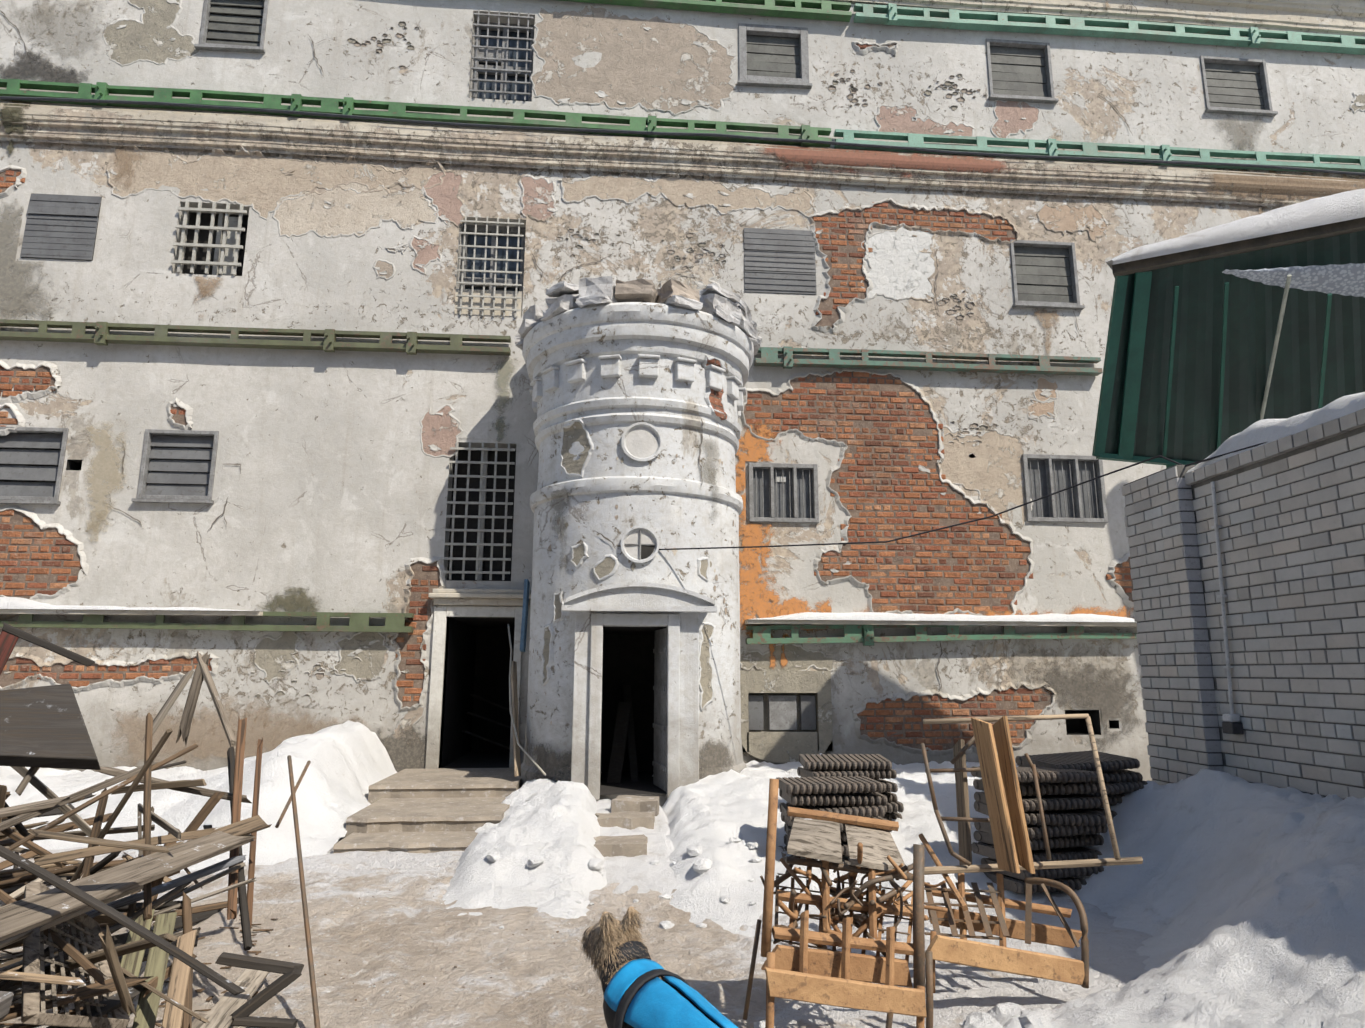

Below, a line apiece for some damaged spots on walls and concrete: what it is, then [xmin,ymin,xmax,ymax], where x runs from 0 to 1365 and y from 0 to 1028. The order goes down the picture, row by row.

flaking render [102,0,201,67]
flaking render [530,4,737,116]
flaking render [0,165,27,198]
flaking render [518,171,1020,334]
flaking render [0,360,62,436]
flaking render [1026,377,1059,422]
flaking render [543,419,624,478]
flaking render [703,355,1035,616]
flaking render [0,505,89,600]
flaking render [0,651,219,692]
flaking render [250,557,447,759]
flaking render [852,681,1058,757]